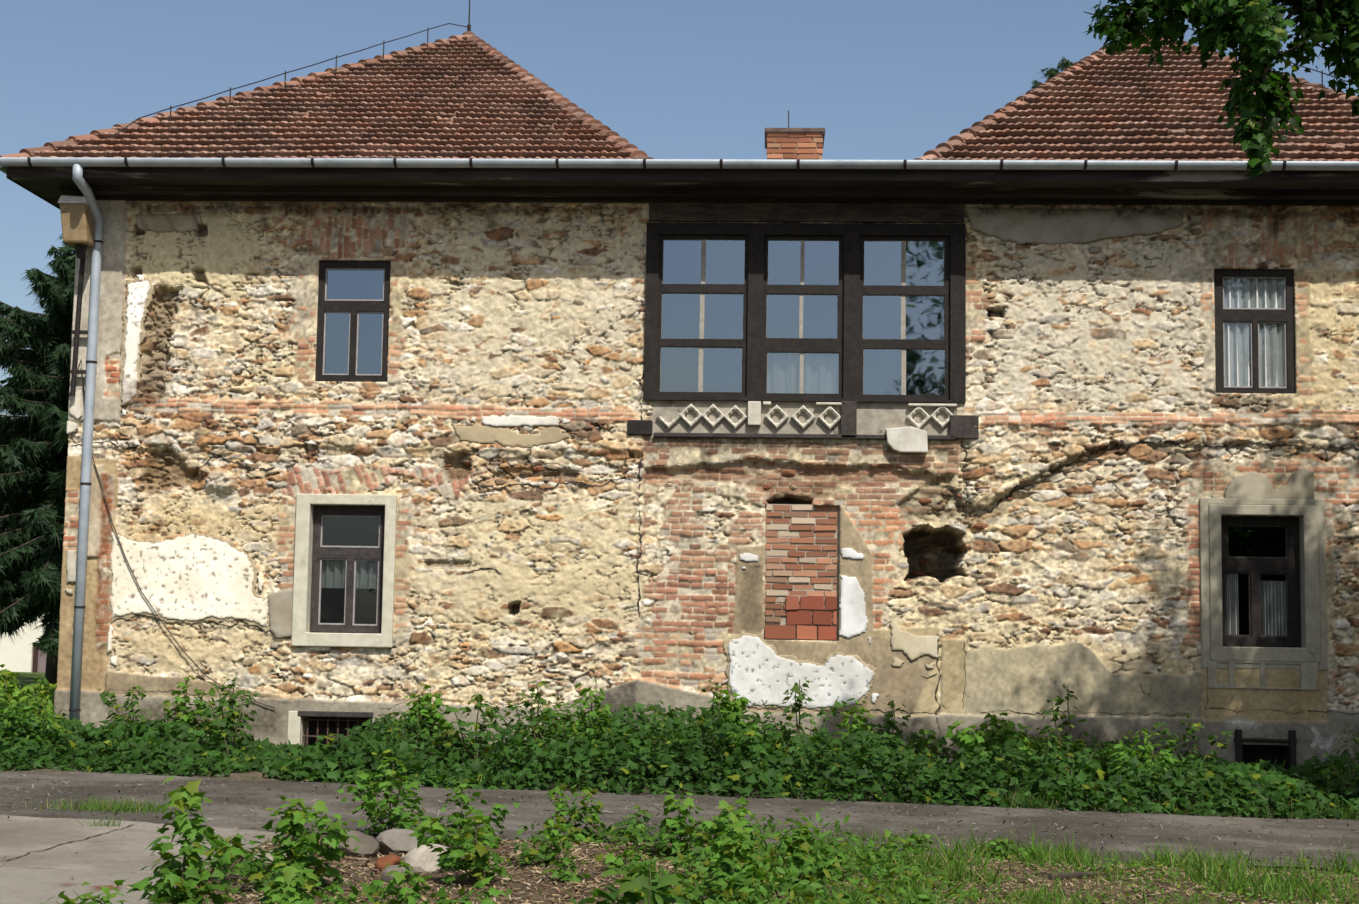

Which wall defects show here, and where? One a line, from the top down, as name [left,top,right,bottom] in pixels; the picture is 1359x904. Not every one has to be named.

flaking render [132,213,208,237]
flaking render [966,207,1202,253]
spalling [986,307,1006,318]
spalling [119,266,209,416]
spalling [135,444,208,497]
flaking render [438,414,588,485]
crack [962,440,1359,516]
spalling [643,440,1123,583]
spalling [422,559,472,569]
flaking render [107,530,293,666]
spalling [507,601,521,616]